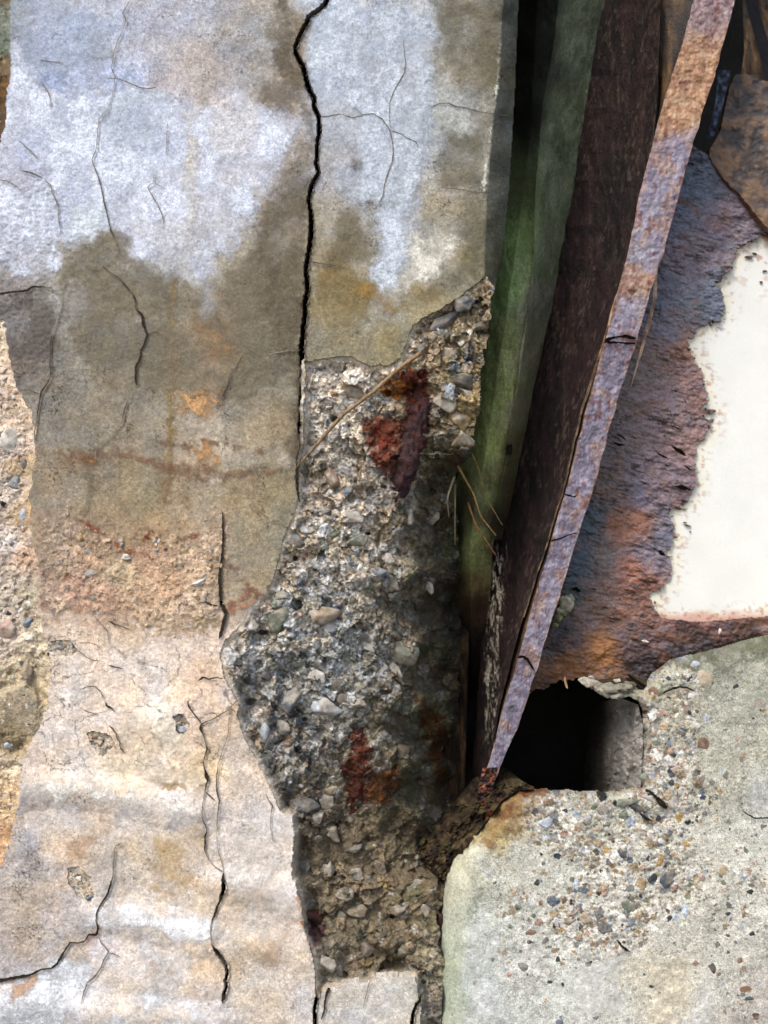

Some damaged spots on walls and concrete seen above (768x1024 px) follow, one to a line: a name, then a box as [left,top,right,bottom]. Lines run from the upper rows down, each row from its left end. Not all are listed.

leakage [0,20,312,466]
spalling [293,0,326,216]
crack [213,0,418,502]
crack [0,843,122,1001]
spalling [0,319,228,866]
crack [187,676,239,1004]
crack [205,512,228,639]
spalling [220,190,509,1024]
rust [340,731,399,805]
rust [360,366,431,490]
rust [523,277,622,617]
peeling [649,235,768,634]